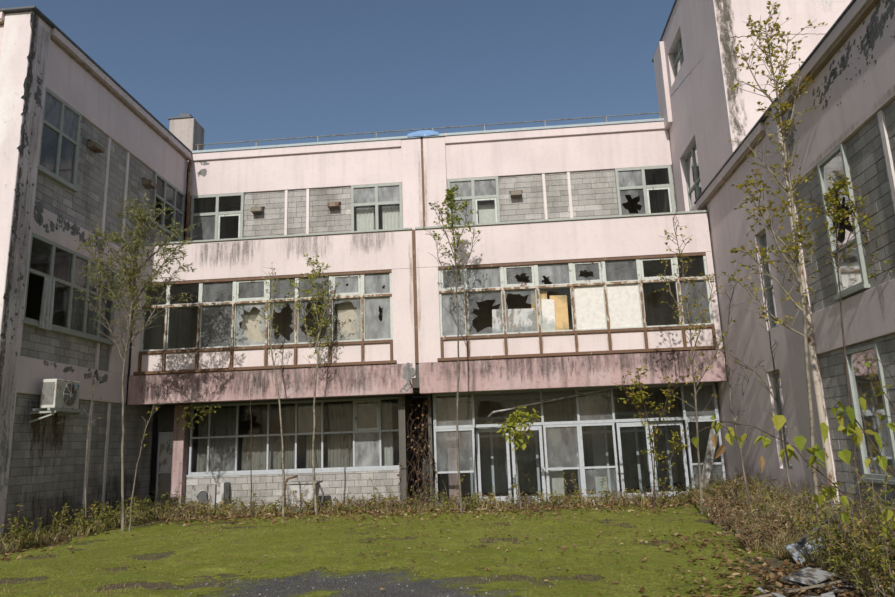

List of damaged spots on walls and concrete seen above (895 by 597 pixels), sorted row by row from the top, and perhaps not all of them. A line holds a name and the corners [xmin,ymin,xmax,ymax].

water stain [715,0,741,145]
peeling [812,0,895,110]
spalling [0,11,109,356]
water stain [23,401,69,453]
peeling [43,360,108,386]